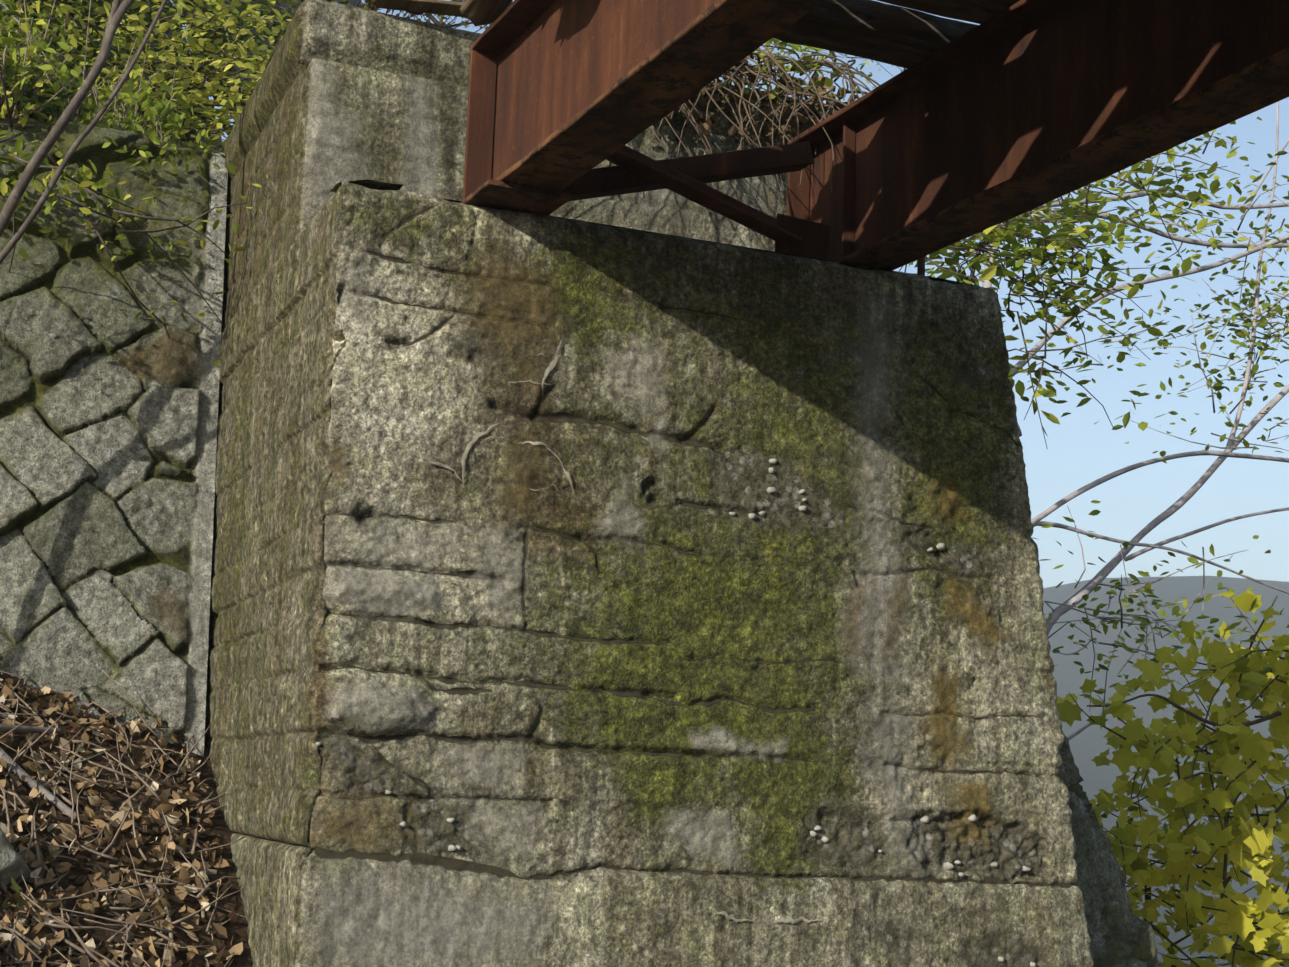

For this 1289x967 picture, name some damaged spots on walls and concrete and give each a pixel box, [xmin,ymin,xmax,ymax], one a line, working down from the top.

crack [892,378,1018,451]
crack [326,513,461,524]
crack [326,526,858,665]
crack [679,501,759,515]
damp [857,468,895,670]
crack [318,665,816,801]